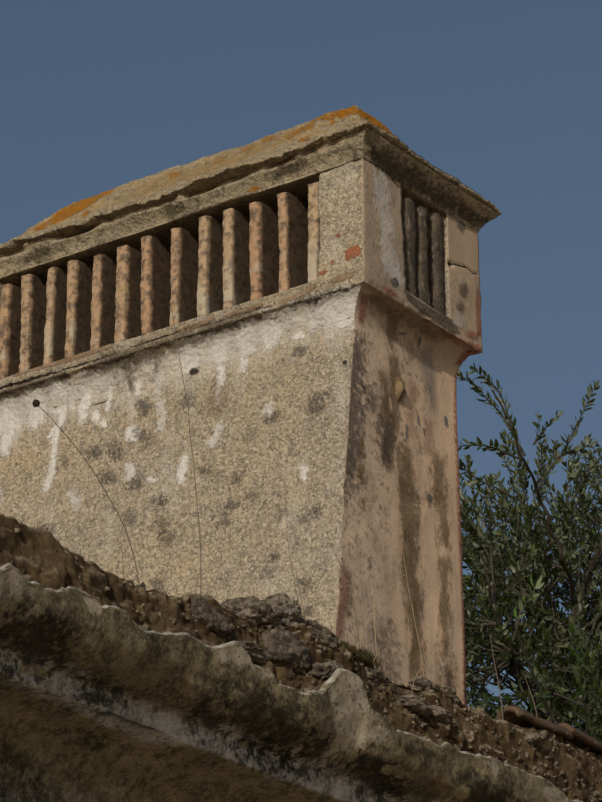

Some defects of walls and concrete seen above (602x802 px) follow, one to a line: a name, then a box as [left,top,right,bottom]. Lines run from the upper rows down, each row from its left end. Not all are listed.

damp [0,284,452,688]
damp [69,676,128,718]